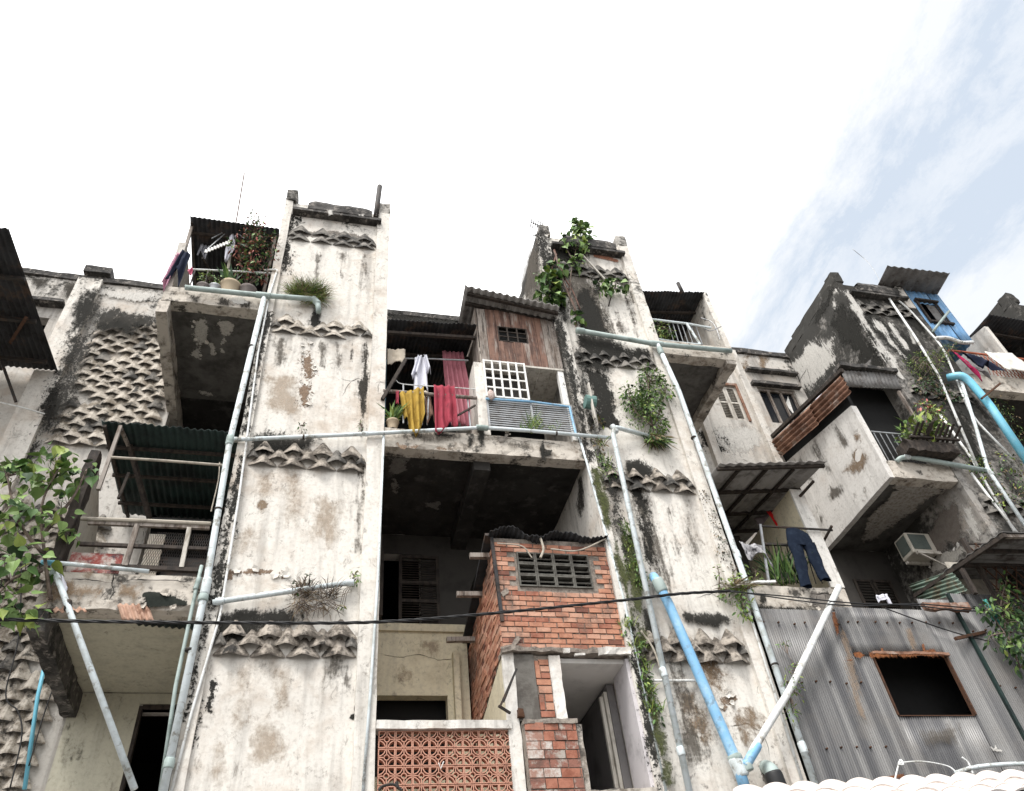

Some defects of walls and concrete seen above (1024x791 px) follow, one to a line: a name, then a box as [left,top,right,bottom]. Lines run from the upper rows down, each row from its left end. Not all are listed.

water stain [30,278,51,296]
water stain [26,282,159,464]
peeling [190,319,234,360]
water stain [533,230,663,575]
water stain [791,287,938,390]
water stain [948,408,989,467]
water stain [182,308,322,749]
spalling [139,588,187,610]
water stain [626,607,663,790]
rust [832,612,941,717]